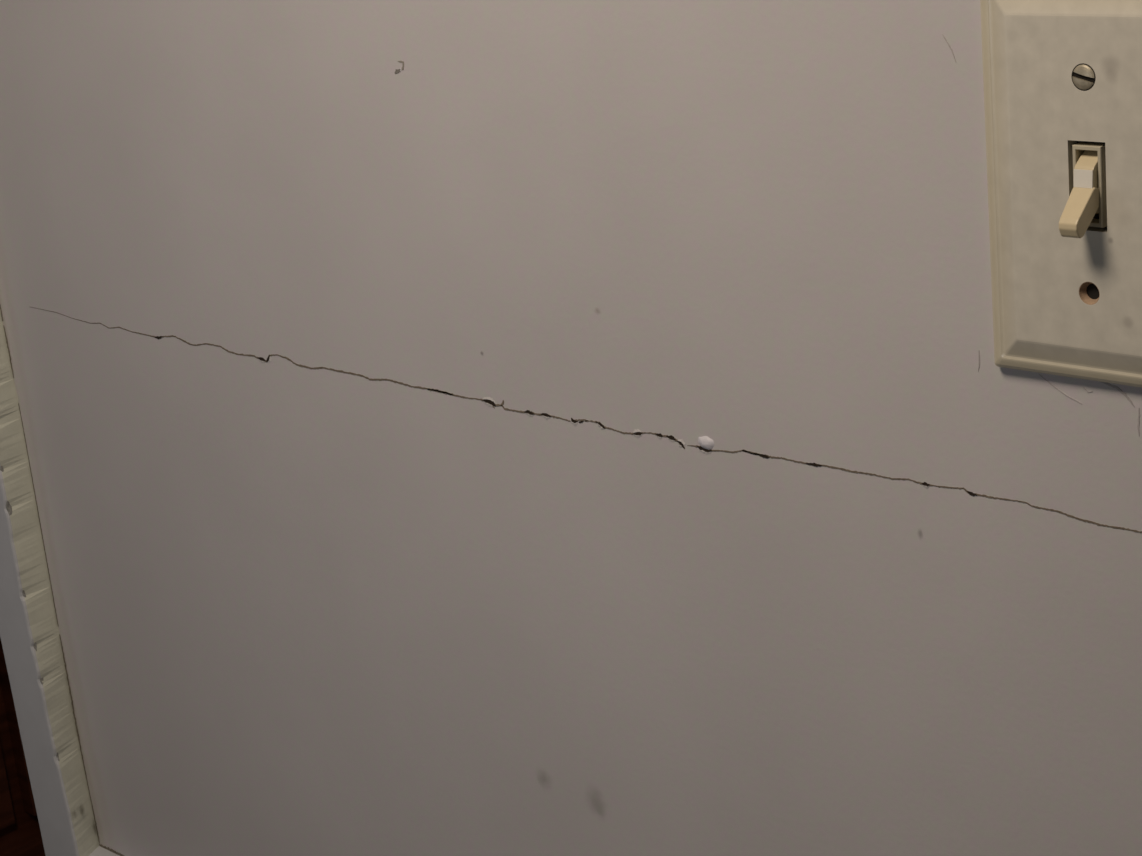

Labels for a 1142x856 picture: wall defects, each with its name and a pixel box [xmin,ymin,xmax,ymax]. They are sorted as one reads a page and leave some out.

crack [32,307,1142,533]